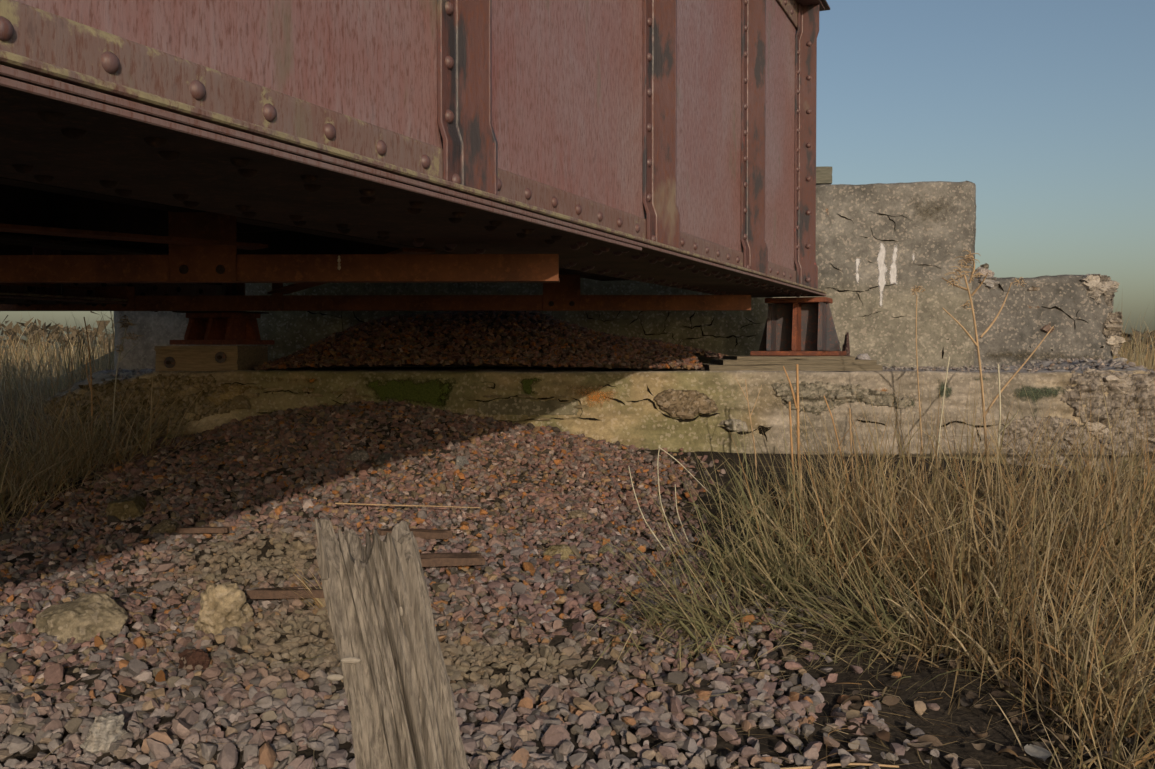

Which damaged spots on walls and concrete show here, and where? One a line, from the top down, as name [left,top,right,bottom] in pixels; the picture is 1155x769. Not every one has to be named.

crack [828,211,907,318]
leakage [877,243,897,306]
crack [586,311,760,347]
crack [1041,306,1088,327]
spalling [1074,274,1126,357]
crack [464,382,771,442]
spalling [1000,369,1155,481]